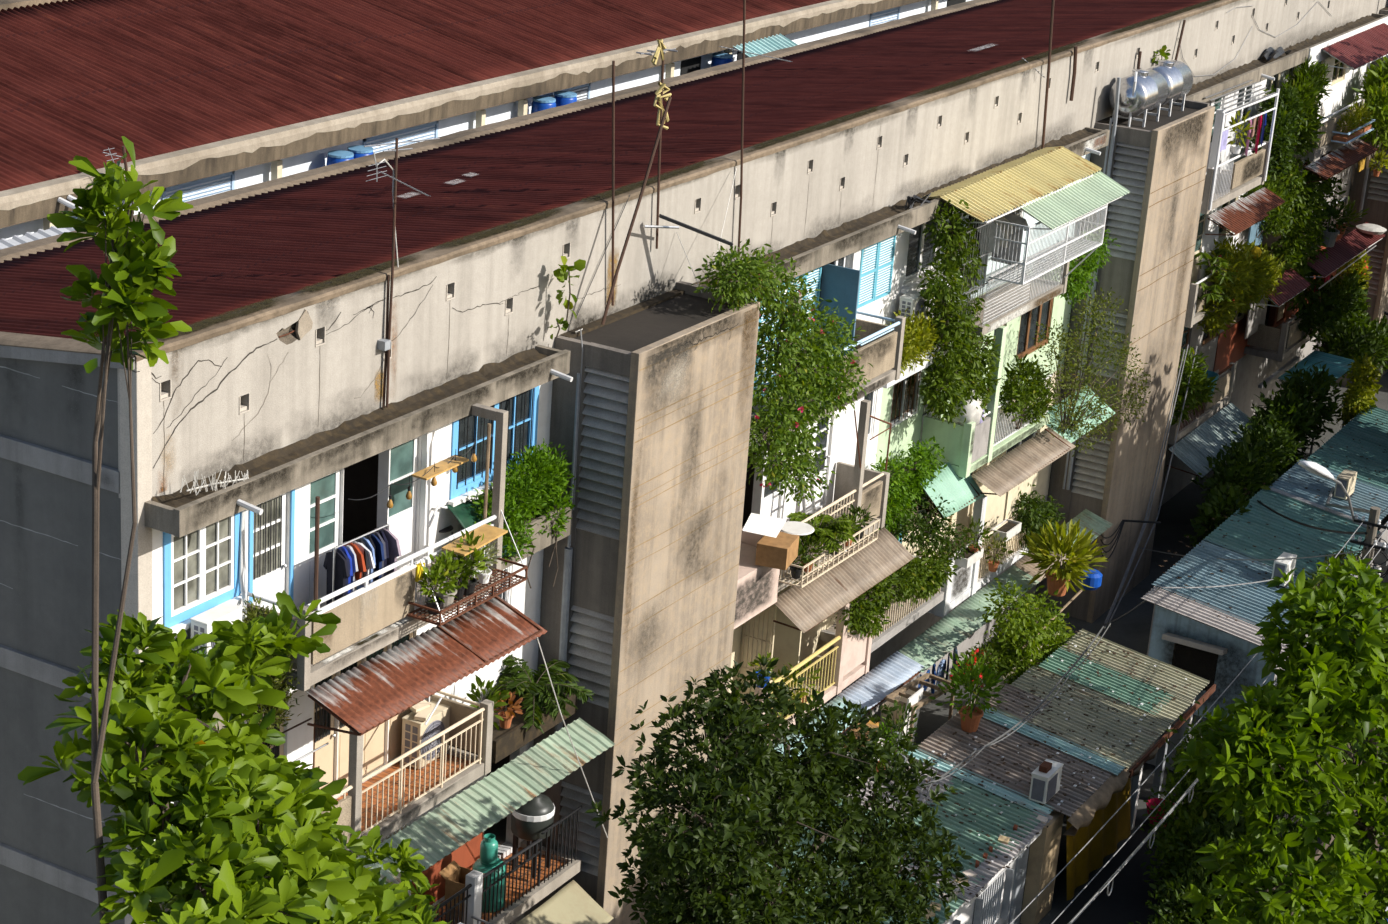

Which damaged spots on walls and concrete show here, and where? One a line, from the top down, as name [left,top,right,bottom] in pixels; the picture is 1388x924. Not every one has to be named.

crack [0,366,117,402]
crack [126,339,288,468]
crack [323,276,621,399]
water stain [622,308,759,635]
water stain [618,570,772,696]